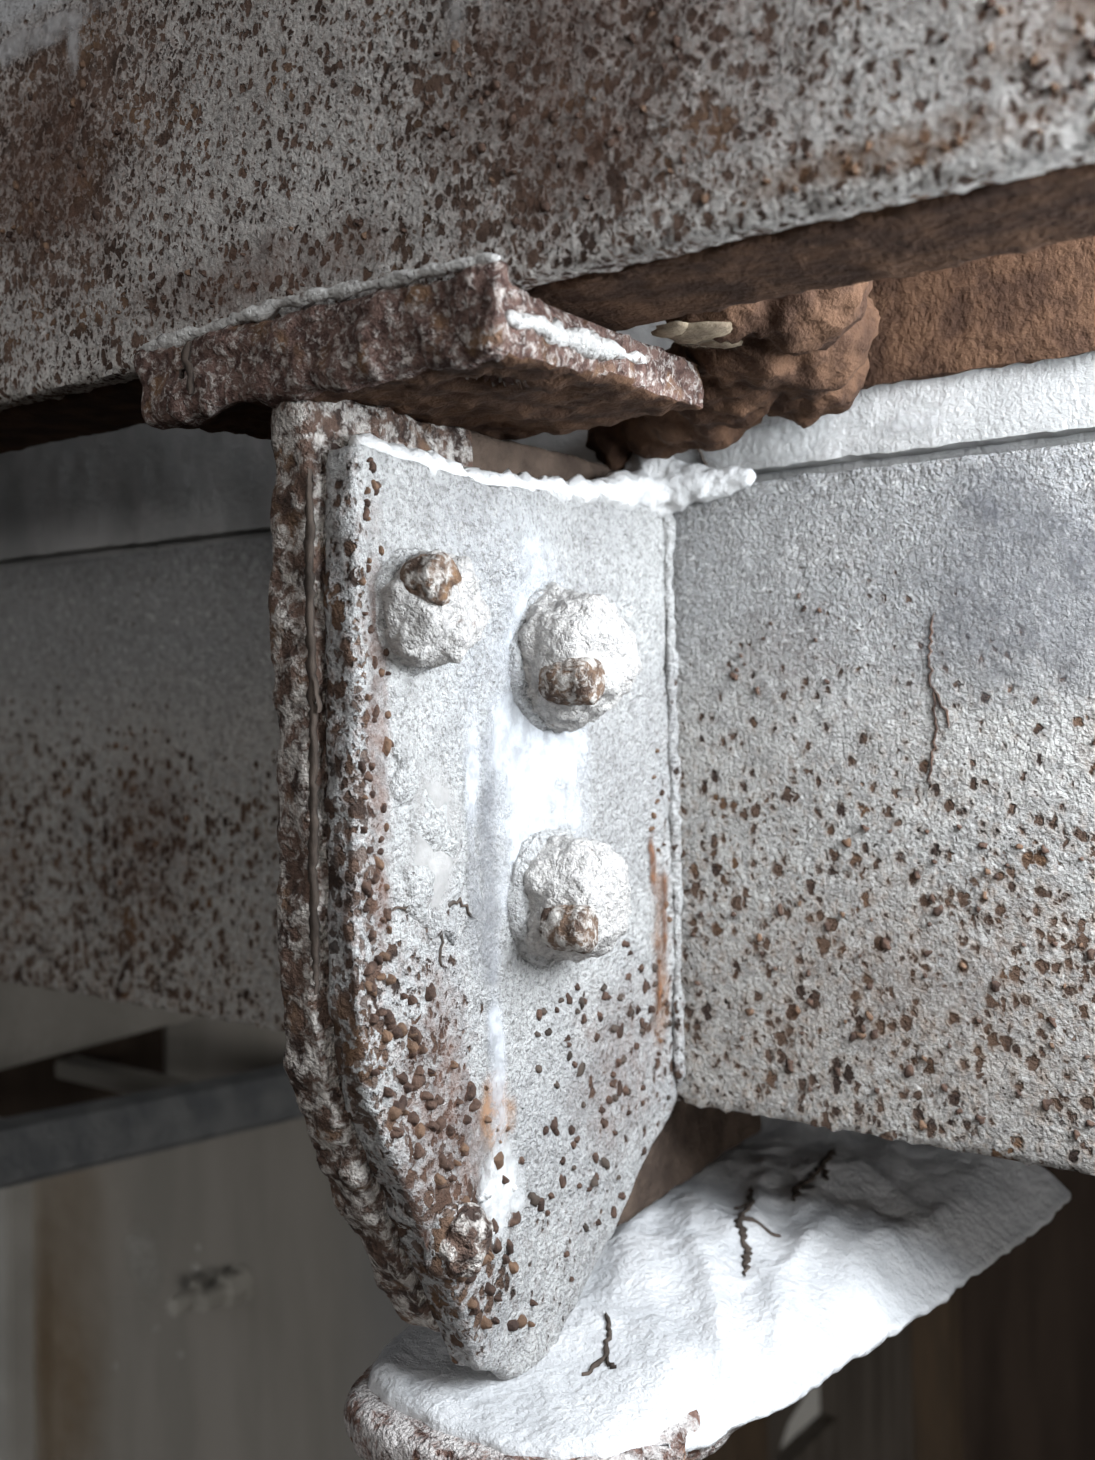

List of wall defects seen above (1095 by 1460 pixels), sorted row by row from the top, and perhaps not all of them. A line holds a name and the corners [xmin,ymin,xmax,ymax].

rust [1027,26,1095,94]
water stain [704,418,826,466]
rust [363,457,382,521]
rust [358,545,384,586]
rust [372,648,391,677]
crack [927,613,949,787]
rust [358,694,394,942]
rust [927,894,944,926]
water stain [478,1139,520,1236]
crack [791,1148,836,1201]
crack [733,1186,781,1276]
crack [581,1312,617,1376]